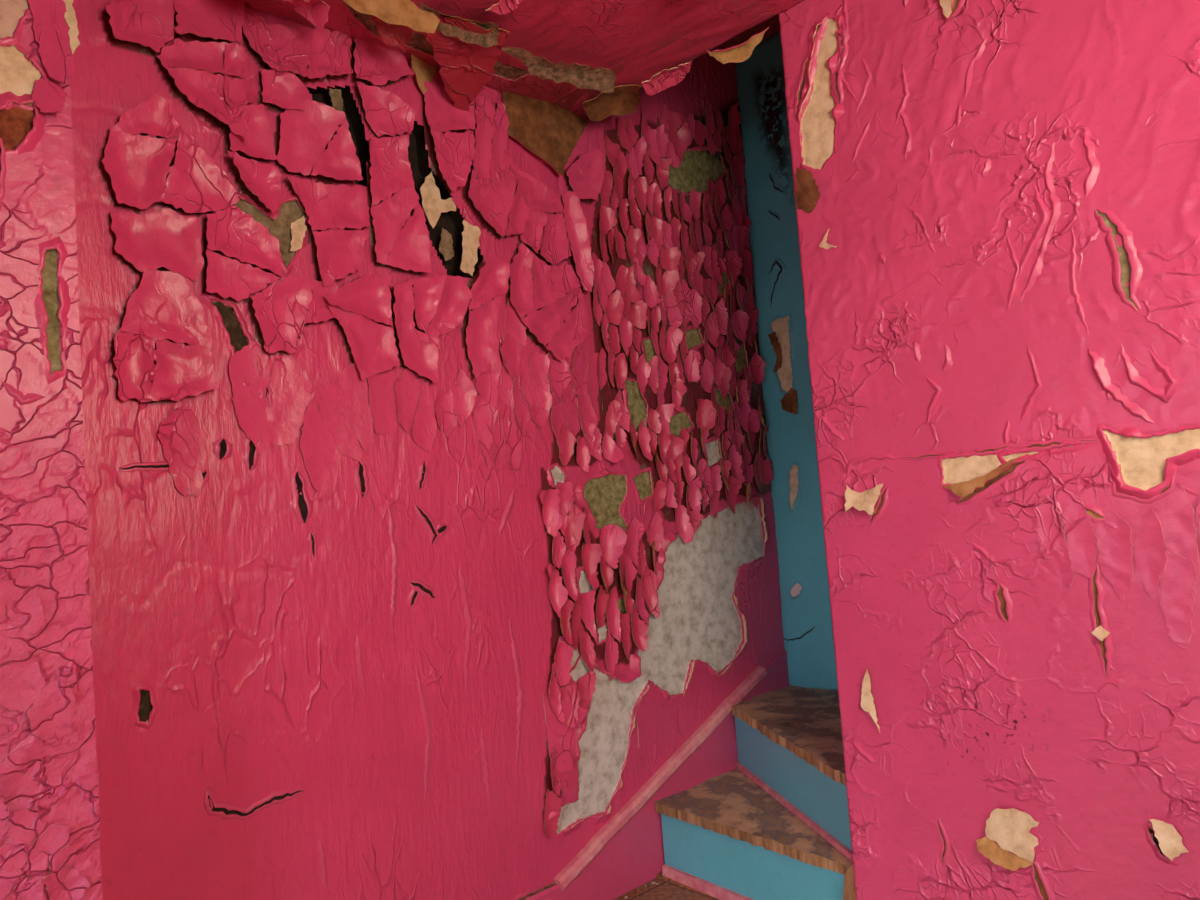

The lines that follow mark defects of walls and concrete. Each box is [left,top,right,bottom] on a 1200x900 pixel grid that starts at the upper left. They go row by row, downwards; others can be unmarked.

peeling [0,0,80,155]
peeling [793,13,850,213]
crack [0,138,8,210]
peeling [34,236,71,384]
crack [1,381,45,405]
peeling [102,0,801,839]
crack [902,438,1099,461]
crack [993,583,1013,622]
crack [1088,564,1114,678]
peeling [0,652,90,900]
crack [935,817,950,866]
peeling [976,808,1040,871]